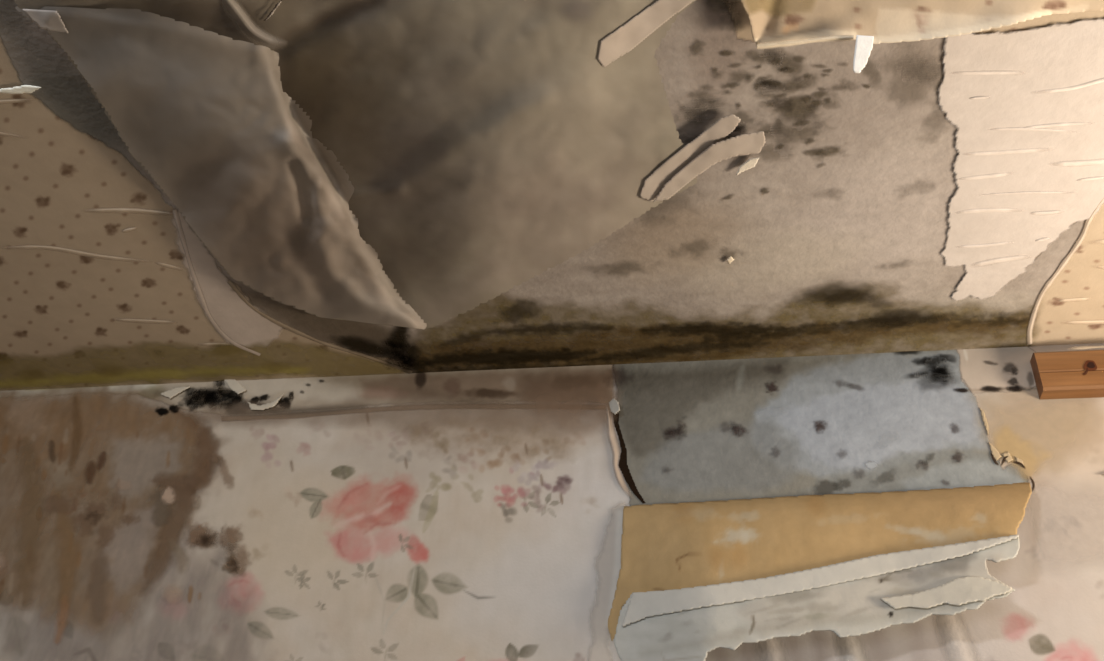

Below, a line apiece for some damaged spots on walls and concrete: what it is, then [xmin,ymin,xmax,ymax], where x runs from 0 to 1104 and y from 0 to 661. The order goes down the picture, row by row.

crack [263,0,282,21]
water stain [749,53,829,125]
water stain [806,140,839,156]
peeling [0,0,1104,506]
water stain [0,289,1036,661]